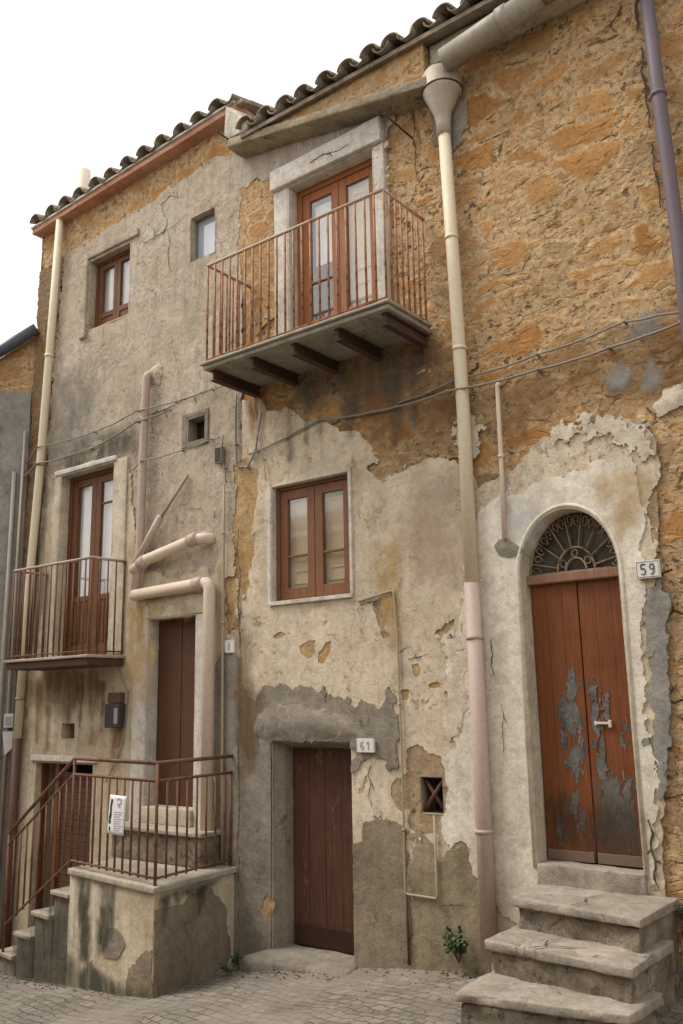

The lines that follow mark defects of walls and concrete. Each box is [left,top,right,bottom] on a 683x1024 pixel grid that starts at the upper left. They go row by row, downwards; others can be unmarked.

crack [634,0,661,208]
spalling [237,179,275,335]
spalling [335,363,459,483]
flaking render [470,415,487,471]
flaking render [542,412,656,462]
spalling [300,640,331,664]
flaking render [412,619,470,741]
spalling [391,744,448,841]
peeling [553,667,640,853]
crack [647,820,662,890]
water stain [13,880,146,998]
spalling [124,887,231,999]